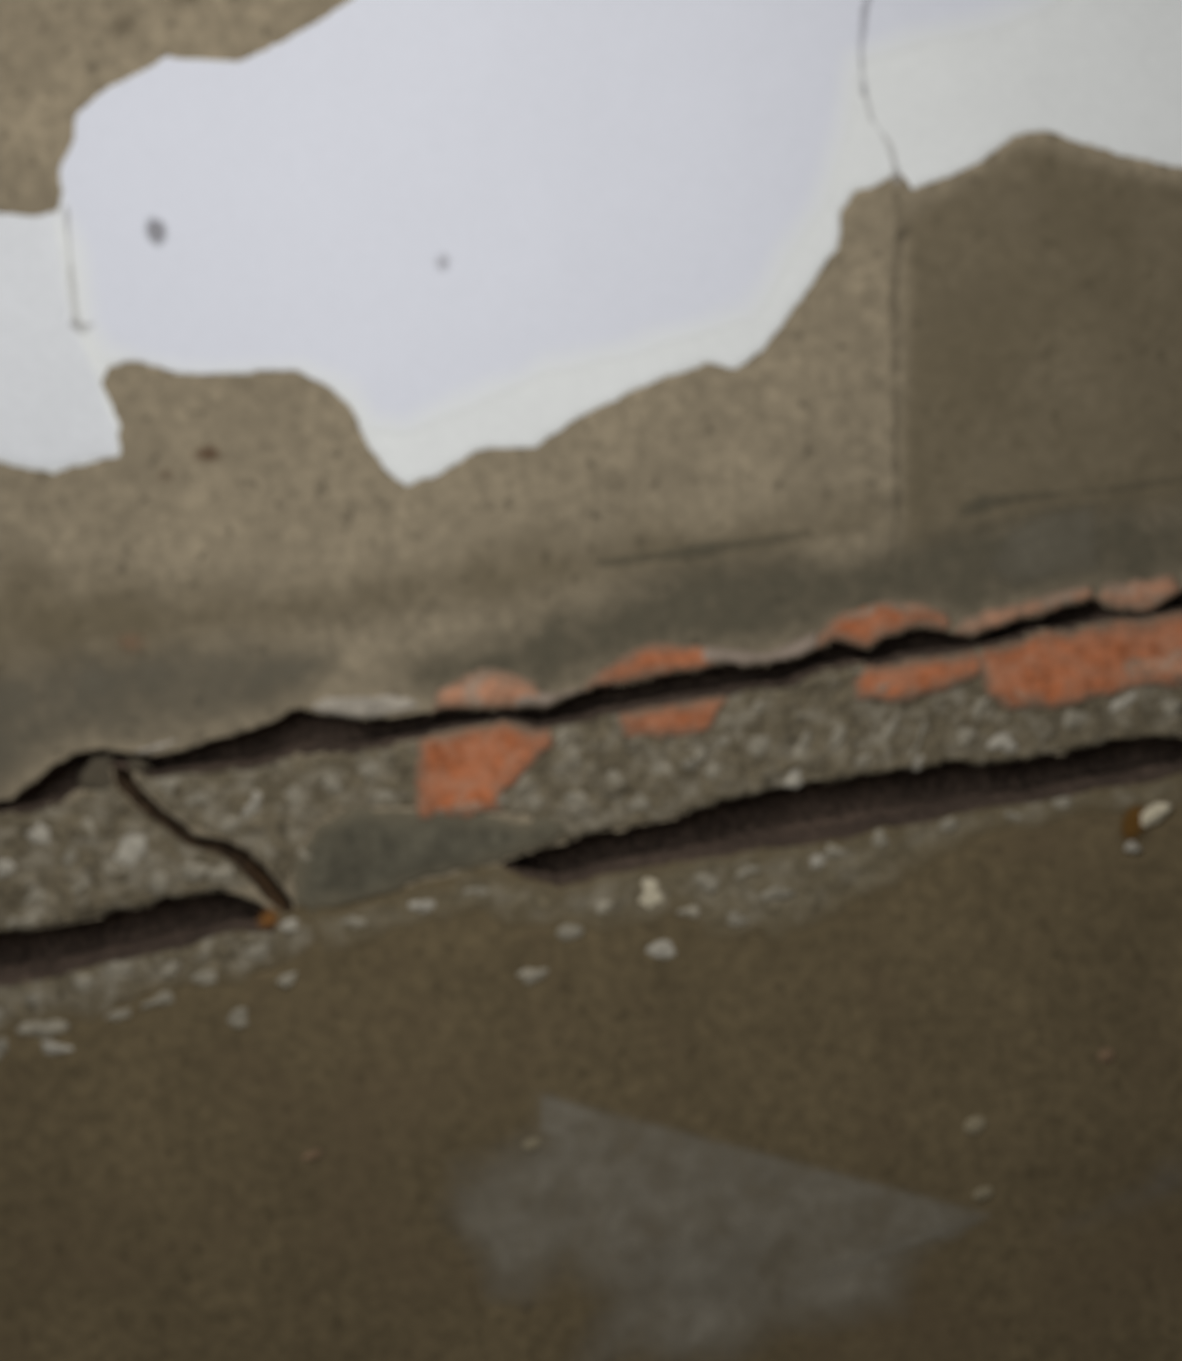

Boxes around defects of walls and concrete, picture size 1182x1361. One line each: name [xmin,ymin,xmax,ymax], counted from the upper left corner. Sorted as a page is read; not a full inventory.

peeling [0,0,1182,486]
crack [0,593,1182,986]